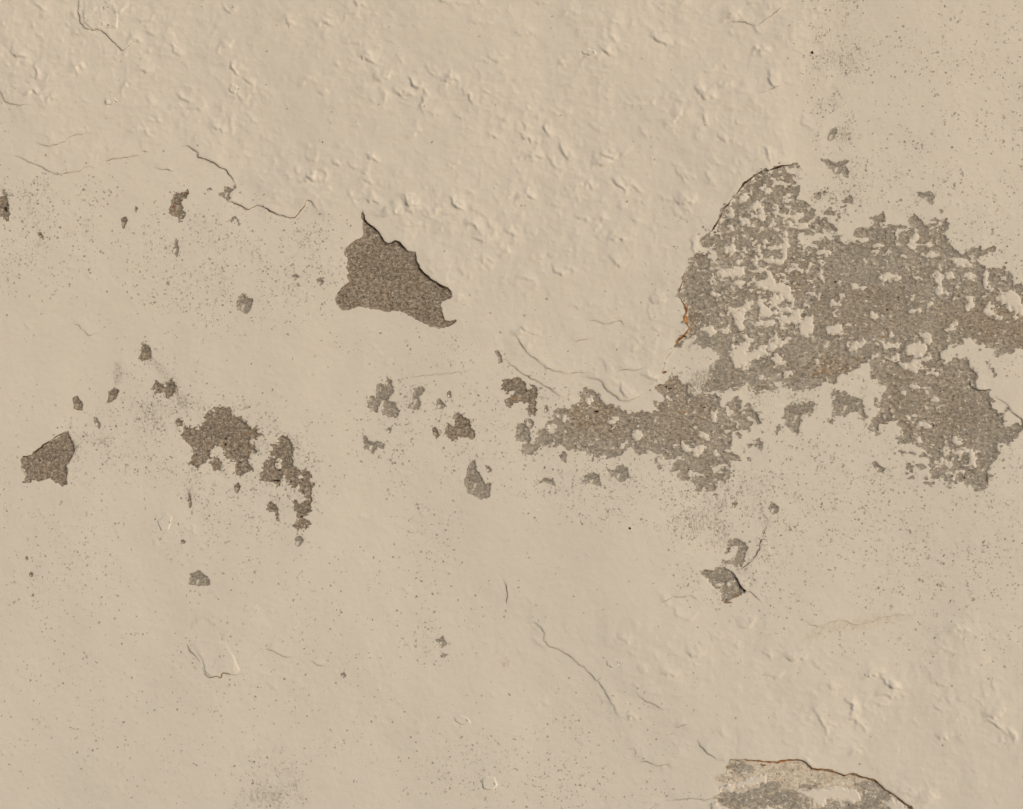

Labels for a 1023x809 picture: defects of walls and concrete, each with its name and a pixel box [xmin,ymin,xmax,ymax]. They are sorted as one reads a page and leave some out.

crack [188,146,316,218]
peeling [821,158,850,178]
peeling [335,212,457,329]
peeling [501,162,1023,499]
peeling [20,431,75,486]
peeling [175,404,315,546]
peeling [363,377,425,454]
peeling [432,412,476,441]
peeling [464,460,492,500]
peeling [700,538,749,603]
peeling [709,759,913,809]